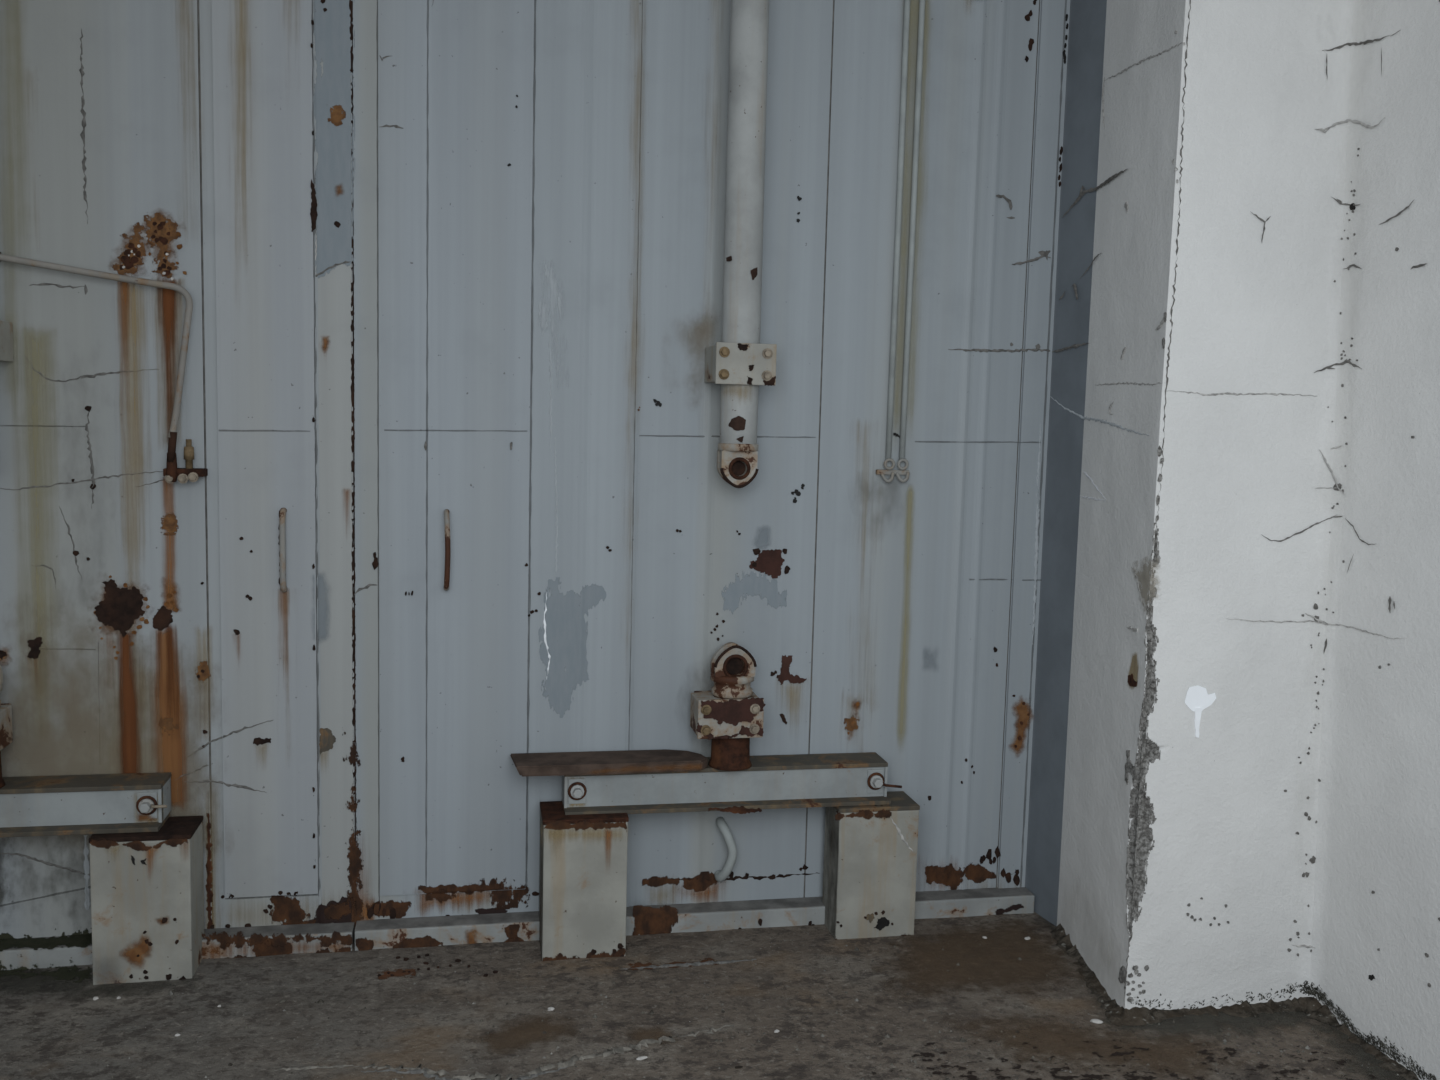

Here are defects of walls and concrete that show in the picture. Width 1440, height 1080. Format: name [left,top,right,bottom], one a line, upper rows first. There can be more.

rust [112,212,187,473]
rust [202,0,539,959]
rust [160,479,178,610]
peeling [528,437,606,718]
peeling [711,529,790,641]
rust [90,838,188,864]
rust [136,796,157,822]
rust [696,697,766,740]
spalling [1118,521,1161,1002]
rust [123,917,177,979]
rust [377,935,498,980]
damp [872,1039,1377,1080]